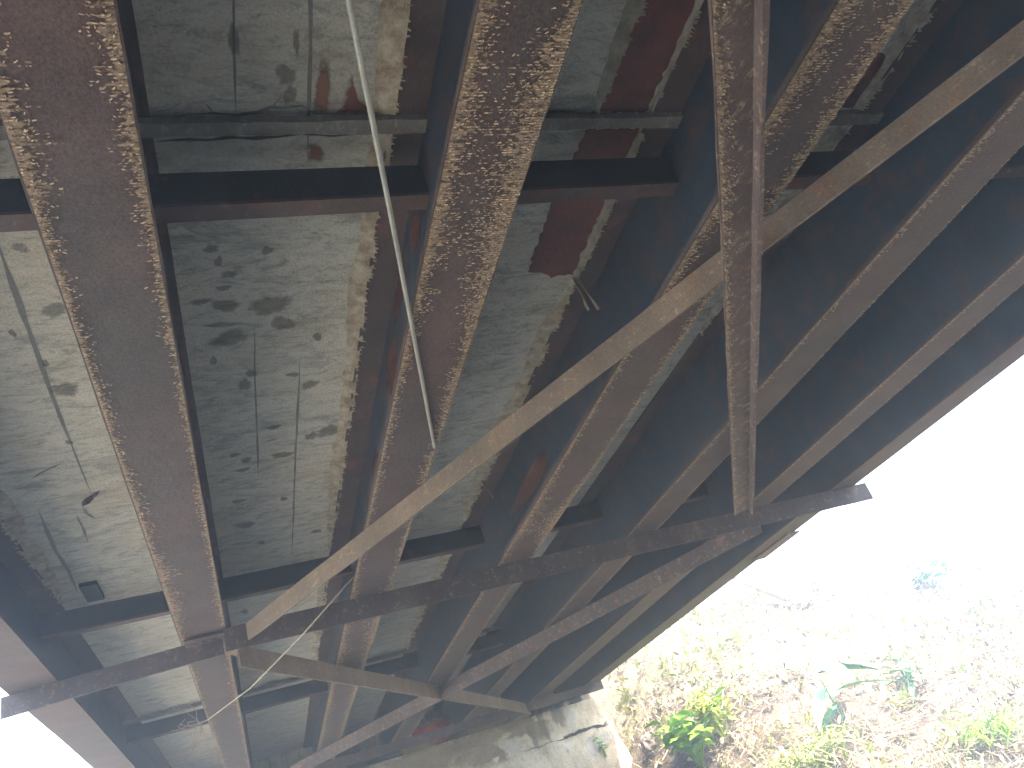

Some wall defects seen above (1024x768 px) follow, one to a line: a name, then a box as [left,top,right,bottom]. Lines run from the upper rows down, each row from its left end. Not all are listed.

corrosion [315,63,368,114]
water stain [192,246,242,364]
water stain [254,299,293,329]
corrosion [394,271,403,322]
water stain [306,425,337,439]
crack [527,721,609,751]